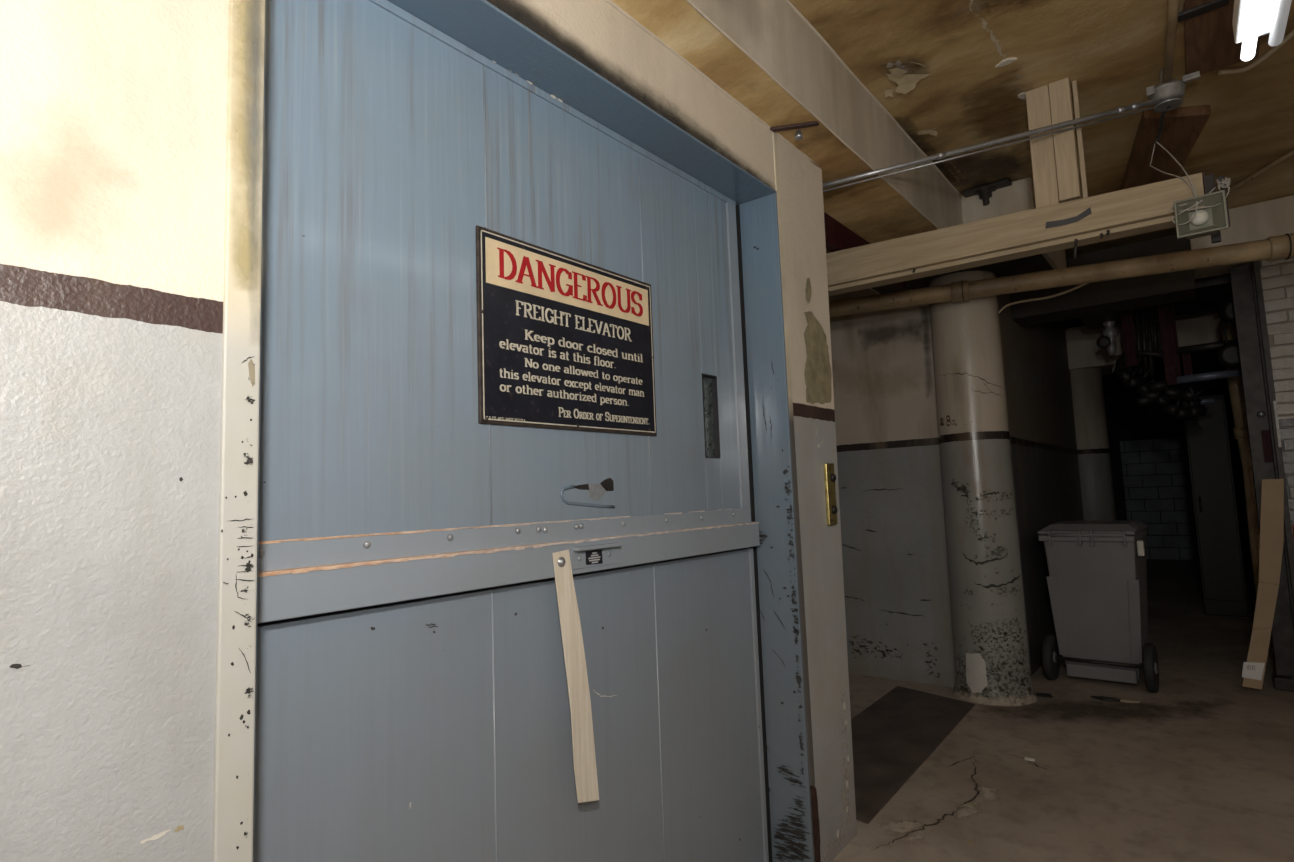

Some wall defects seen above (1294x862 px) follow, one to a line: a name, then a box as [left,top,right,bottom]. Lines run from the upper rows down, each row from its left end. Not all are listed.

peeling [884,61,931,97]
crack [969,0,1026,100]
leakage [237,0,259,280]
peeling [803,278,832,404]
peeling [953,642,1037,706]
crack [872,756,980,850]